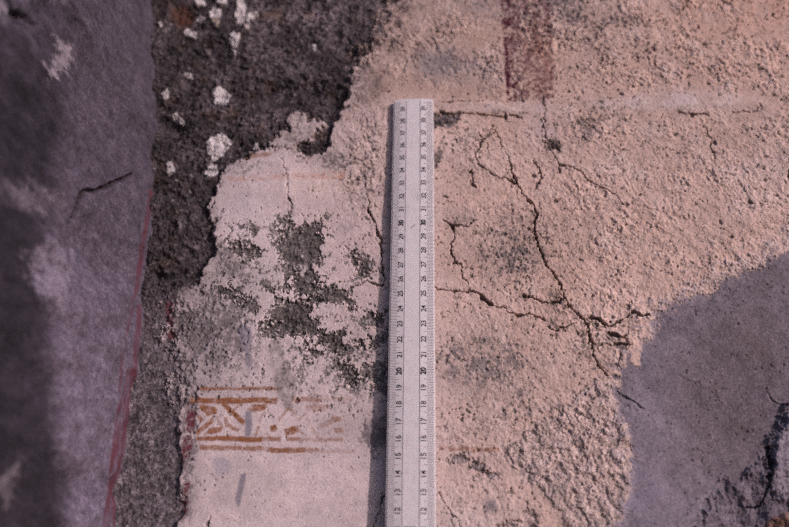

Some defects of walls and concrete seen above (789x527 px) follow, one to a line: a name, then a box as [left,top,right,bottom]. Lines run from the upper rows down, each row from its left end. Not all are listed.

crack [67,172,133,223]
crack [350,192,386,289]
crack [434,98,650,409]
flaking render [210,205,390,406]
crack [373,494,386,527]